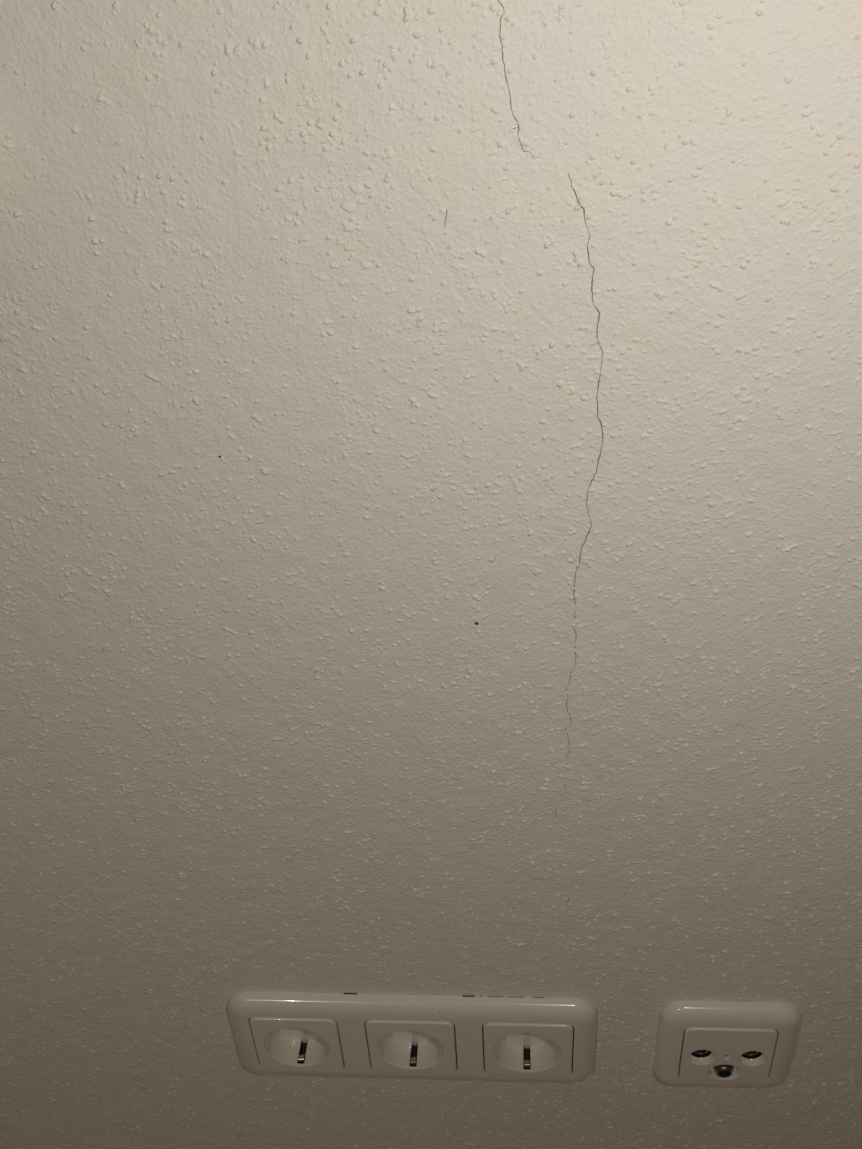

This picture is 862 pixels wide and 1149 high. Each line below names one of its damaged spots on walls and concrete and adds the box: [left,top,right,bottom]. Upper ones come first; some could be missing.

crack [498,0,532,158]
crack [555,173,603,817]